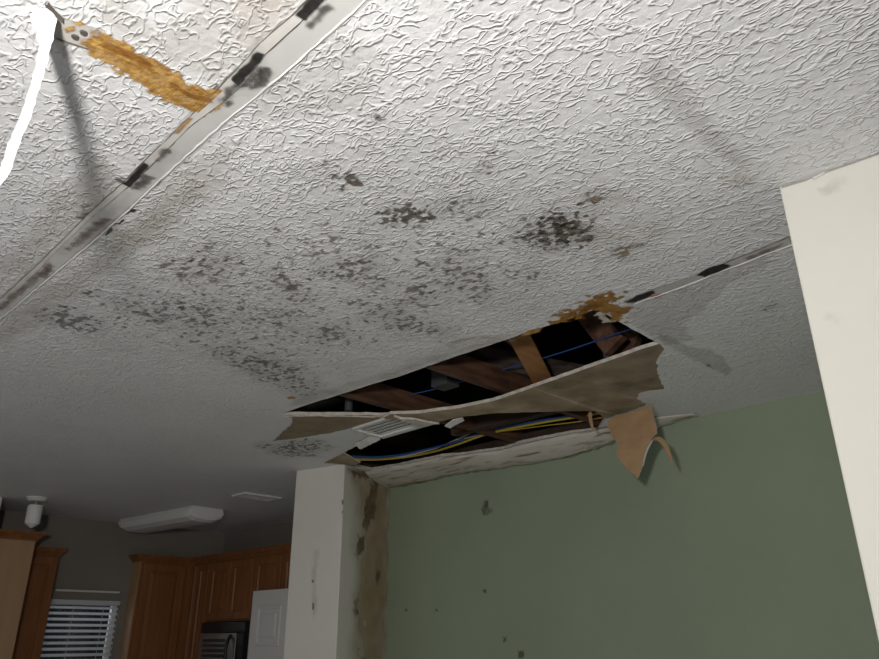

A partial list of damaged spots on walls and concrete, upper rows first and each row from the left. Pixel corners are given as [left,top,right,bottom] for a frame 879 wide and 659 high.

peeling [45,2,103,50]
damp [117,163,154,189]
damp [323,160,363,191]
mould [374,203,436,229]
mould [478,193,603,252]
mould [0,264,52,309]
mould [35,305,100,333]
mould [114,220,539,395]
peeling [275,415,383,441]
peeling [445,417,464,428]
spalling [324,426,616,488]
damp [351,468,389,659]